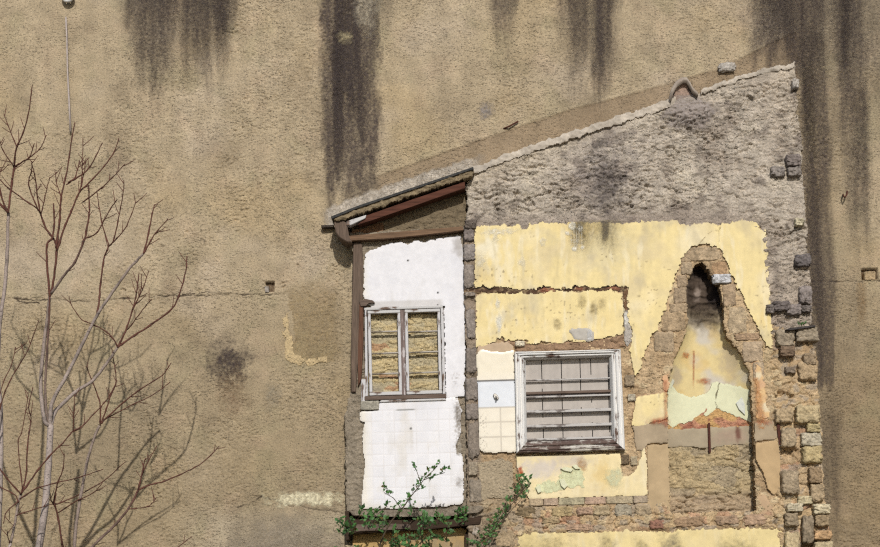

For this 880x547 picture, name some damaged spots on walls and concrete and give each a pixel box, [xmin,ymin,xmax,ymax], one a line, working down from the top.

damp [320,0,380,198]
damp [560,0,611,75]
damp [836,0,863,122]
damp [754,0,835,387]
spalling [497,317,626,352]
peeling [666,379,751,430]